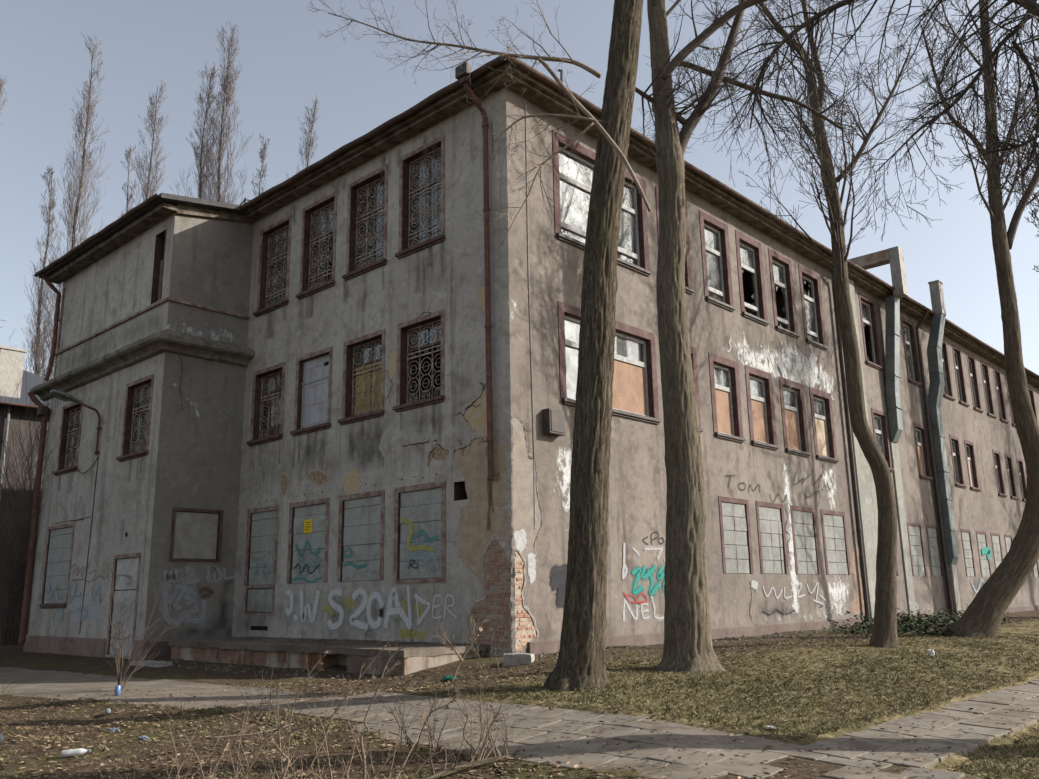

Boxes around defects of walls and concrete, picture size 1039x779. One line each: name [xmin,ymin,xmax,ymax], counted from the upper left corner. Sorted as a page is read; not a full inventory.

peeling [760,342,818,385]
crack [402,382,487,466]
flaking render [427,387,543,653]
leakage [784,463,799,612]
leakage [821,466,836,509]
leakage [810,576,849,618]